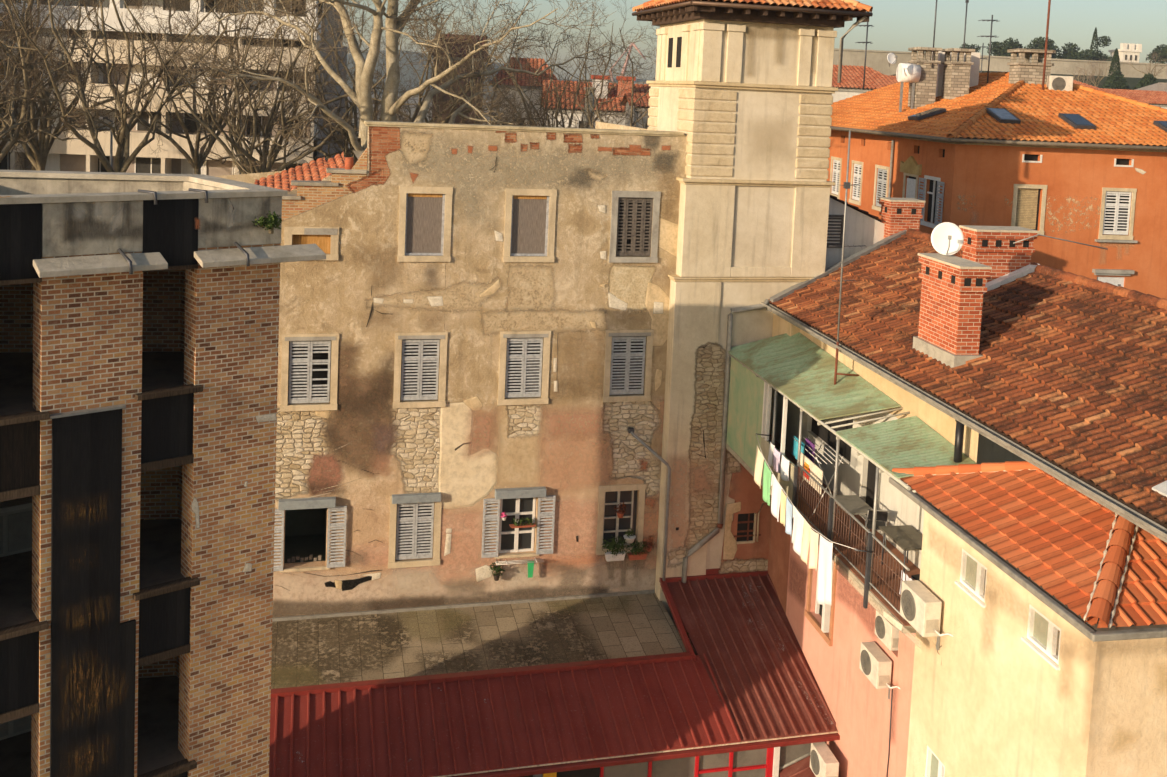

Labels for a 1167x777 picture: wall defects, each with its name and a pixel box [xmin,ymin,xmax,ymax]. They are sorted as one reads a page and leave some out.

flaking render [346,126,400,193]
flaking render [488,131,671,156]
peeling [192,498,200,528]
spalling [256,408,341,501]
water stain [328,346,394,472]
spalling [380,404,441,494]
peeling [405,368,662,579]
spalling [685,343,768,573]
spalling [325,548,389,591]